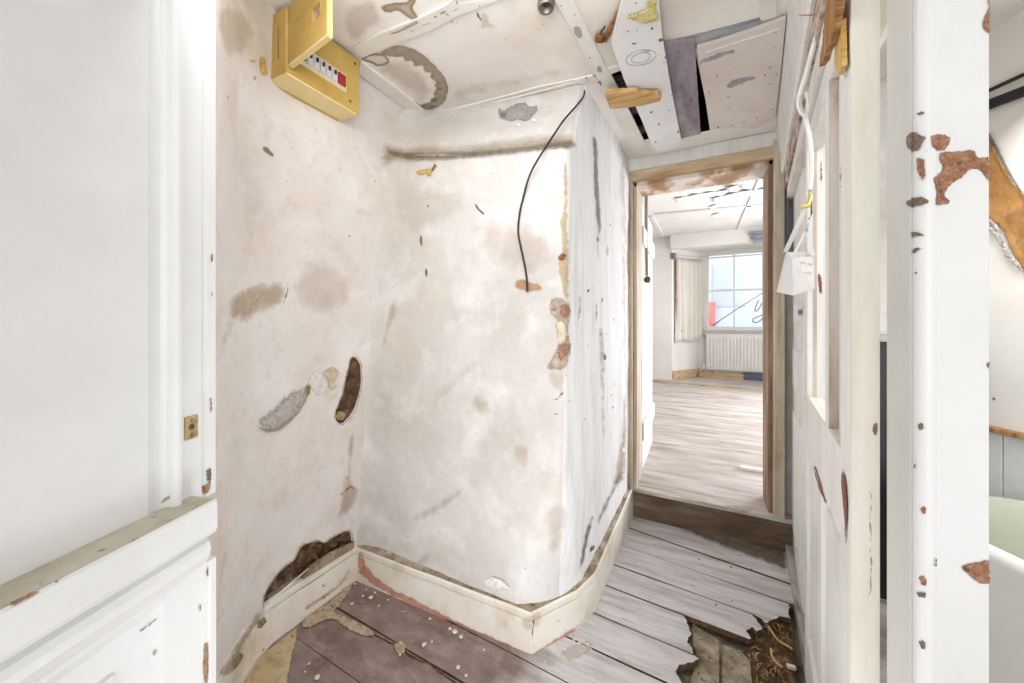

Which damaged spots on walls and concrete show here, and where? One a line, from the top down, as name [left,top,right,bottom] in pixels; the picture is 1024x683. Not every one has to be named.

damp [362,0,448,110]
flaking render [498,102,541,127]
peeling [906,132,990,208]
spalling [547,170,571,370]
spalling [323,357,362,424]
spalling [257,531,354,628]
peeling [963,561,990,584]